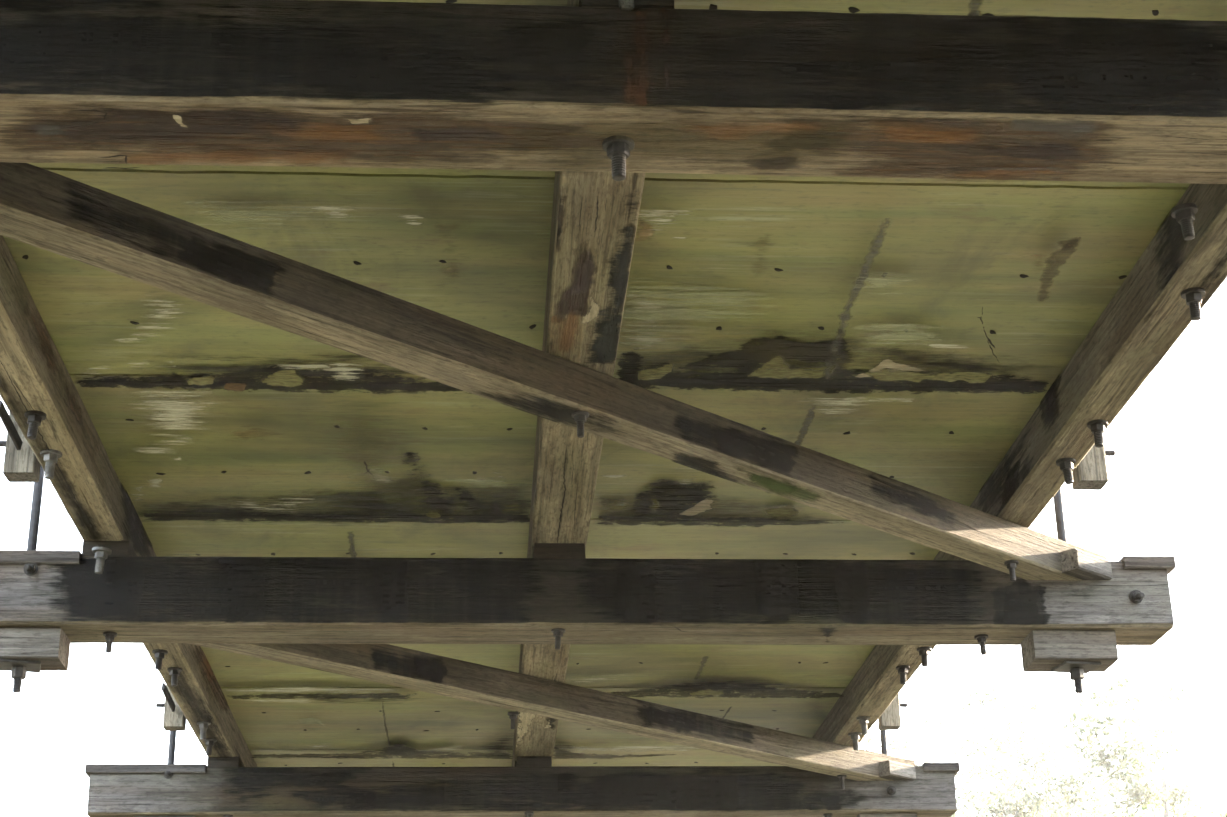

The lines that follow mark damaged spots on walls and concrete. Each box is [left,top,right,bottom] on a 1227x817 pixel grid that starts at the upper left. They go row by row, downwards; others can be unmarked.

damp [585,196,1062,430]
damp [66,355,463,429]
damp [598,415,843,527]
damp [869,475,954,523]
damp [978,430,1033,516]